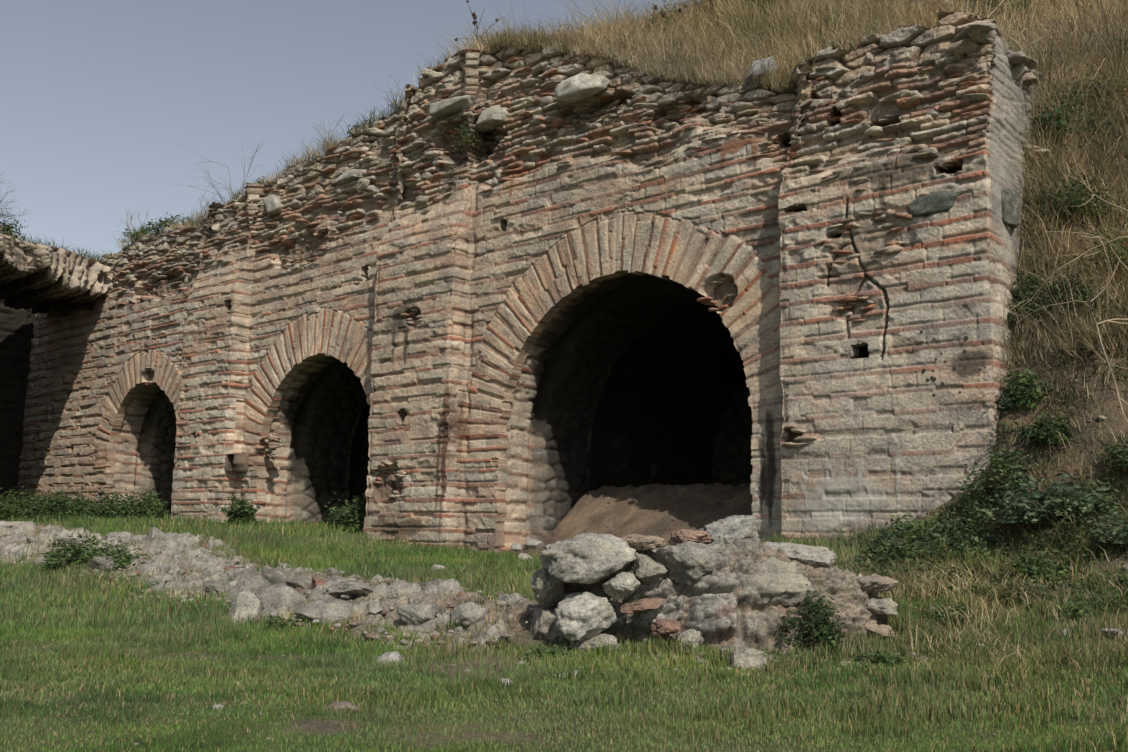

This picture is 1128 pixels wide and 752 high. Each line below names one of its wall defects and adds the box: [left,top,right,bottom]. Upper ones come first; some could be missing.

spalling [697,277,738,312]
crack [823,199,889,357]
damp [759,413,776,517]